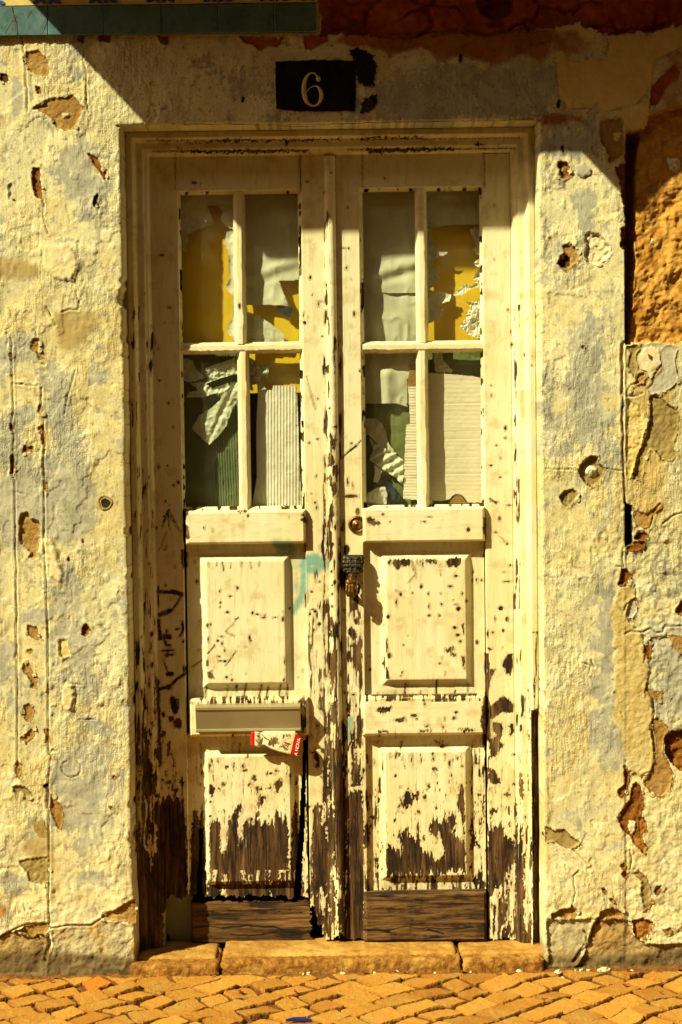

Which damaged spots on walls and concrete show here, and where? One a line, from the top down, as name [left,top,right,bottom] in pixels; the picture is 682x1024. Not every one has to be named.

flaking render [23,50,83,131]
flaking render [30,168,44,199]
flaking render [87,153,108,180]
flaking render [557,65,682,482]
crack [610,342,641,502]
flaking render [17,512,40,559]
flaking render [623,502,662,552]
flaking render [22,624,40,688]
flaking render [609,569,682,855]
flaking render [43,784,63,829]
flaking render [542,825,580,849]
flaking render [545,861,682,960]